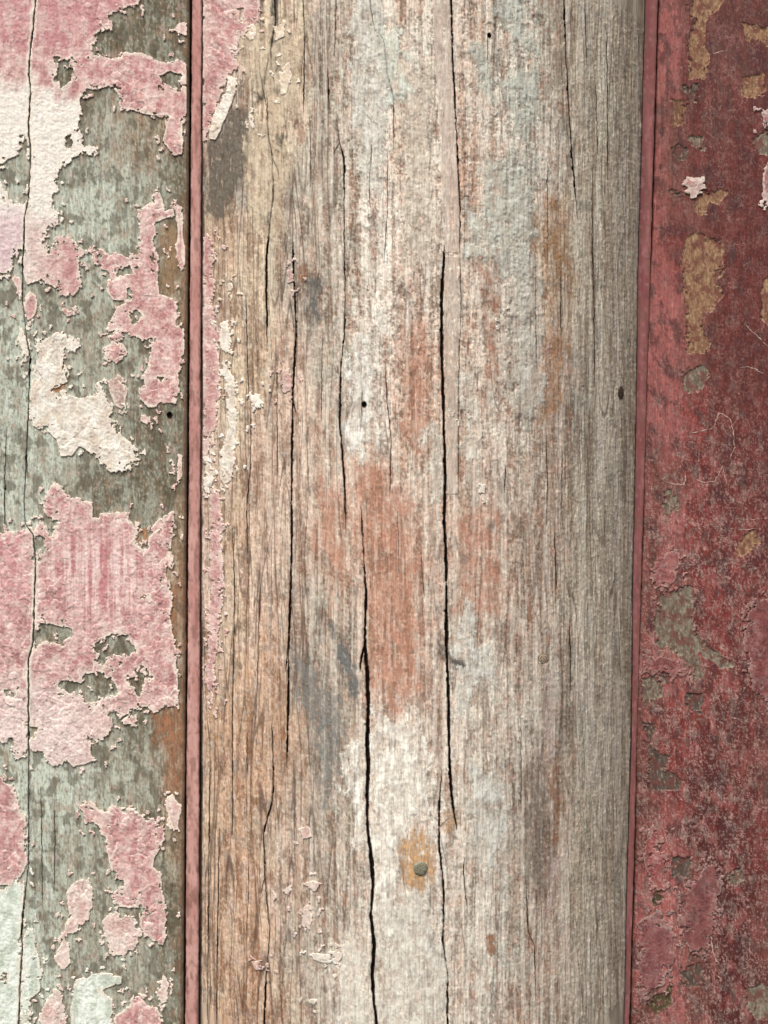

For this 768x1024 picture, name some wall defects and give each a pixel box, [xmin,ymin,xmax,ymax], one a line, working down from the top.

peeling [0,0,187,473]
peeling [202,0,301,142]
peeling [669,176,728,216]
peeling [680,231,726,394]
peeling [740,72,768,211]
peeling [166,446,183,491]
peeling [202,230,303,719]
crack [301,0,467,1024]
peeling [641,545,768,715]
peeling [0,482,184,1024]
rust [398,831,433,891]
peeling [634,825,745,1015]